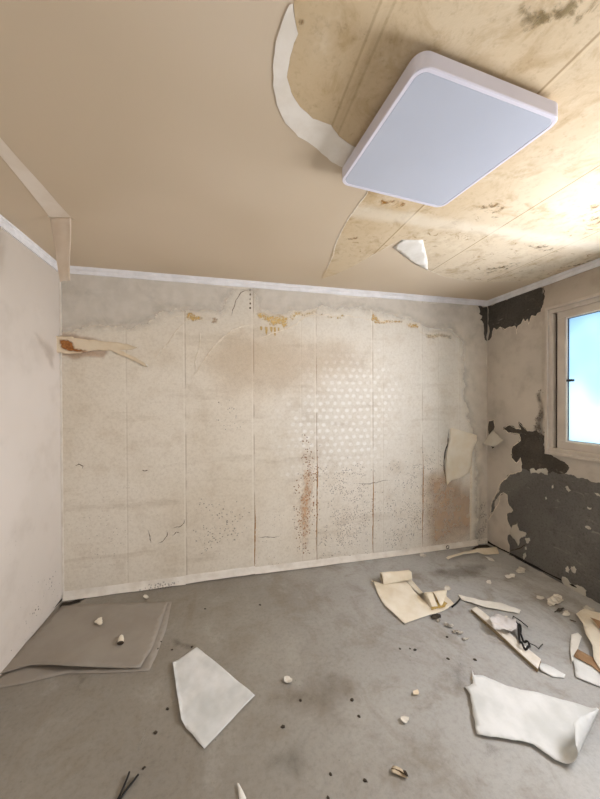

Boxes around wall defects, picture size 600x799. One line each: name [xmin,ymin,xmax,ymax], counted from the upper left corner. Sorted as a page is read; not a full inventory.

damp [523,2,582,25]
peeling [61,274,232,332]
damp [258,313,287,335]
peeling [251,0,600,604]
corrosion [293,435,319,560]